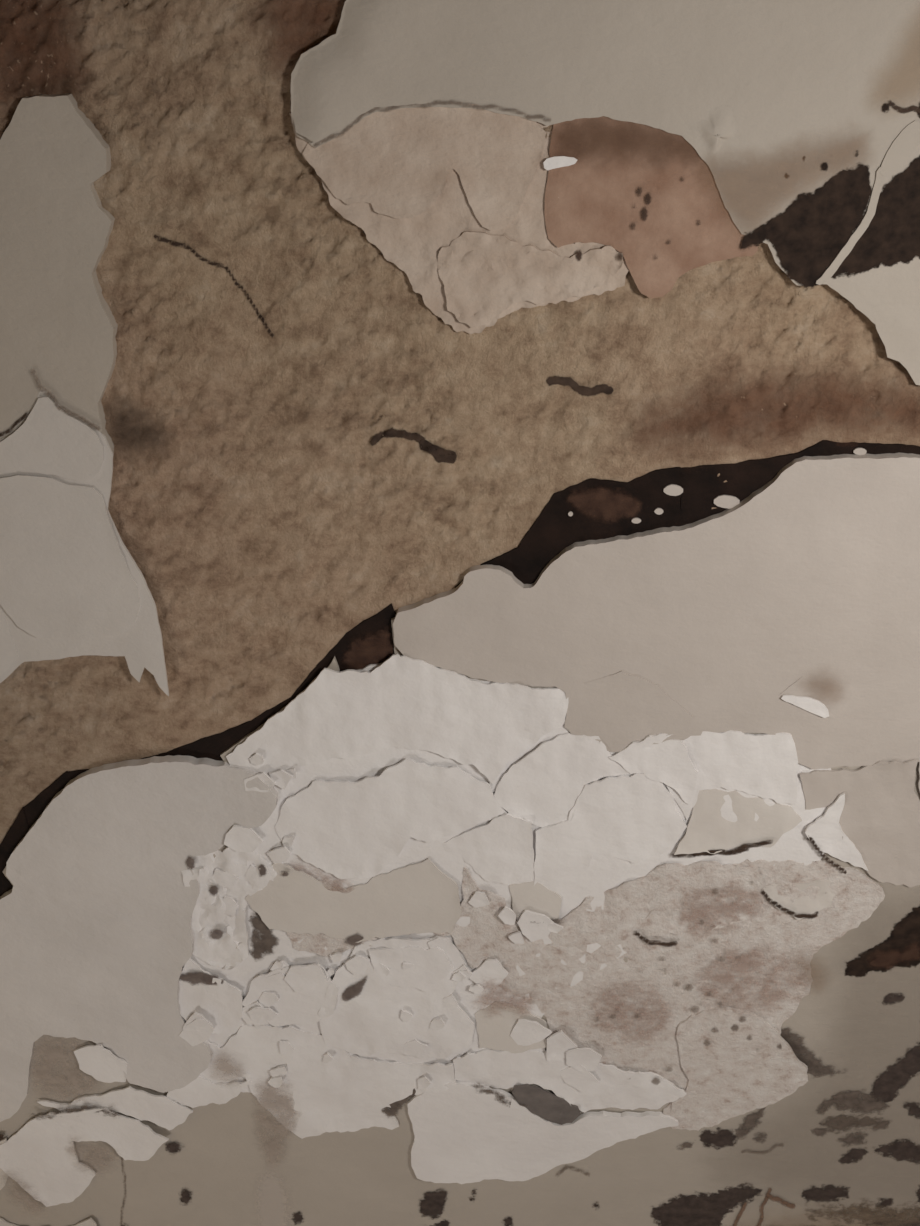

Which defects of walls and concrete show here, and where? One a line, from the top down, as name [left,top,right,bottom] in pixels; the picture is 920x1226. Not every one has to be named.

water stain [631,188,651,229]
spalling [0,0,920,844]
peeling [0,654,920,1210]
water stain [845,907,920,977]
water stain [883,993,905,1005]
water stain [812,1043,920,1164]
water stain [165,1143,181,1153]
water stain [680,1107,766,1150]
water stain [180,1189,192,1204]
water stain [420,1189,450,1226]
water stain [651,1183,762,1226]
water stain [802,1185,920,1226]